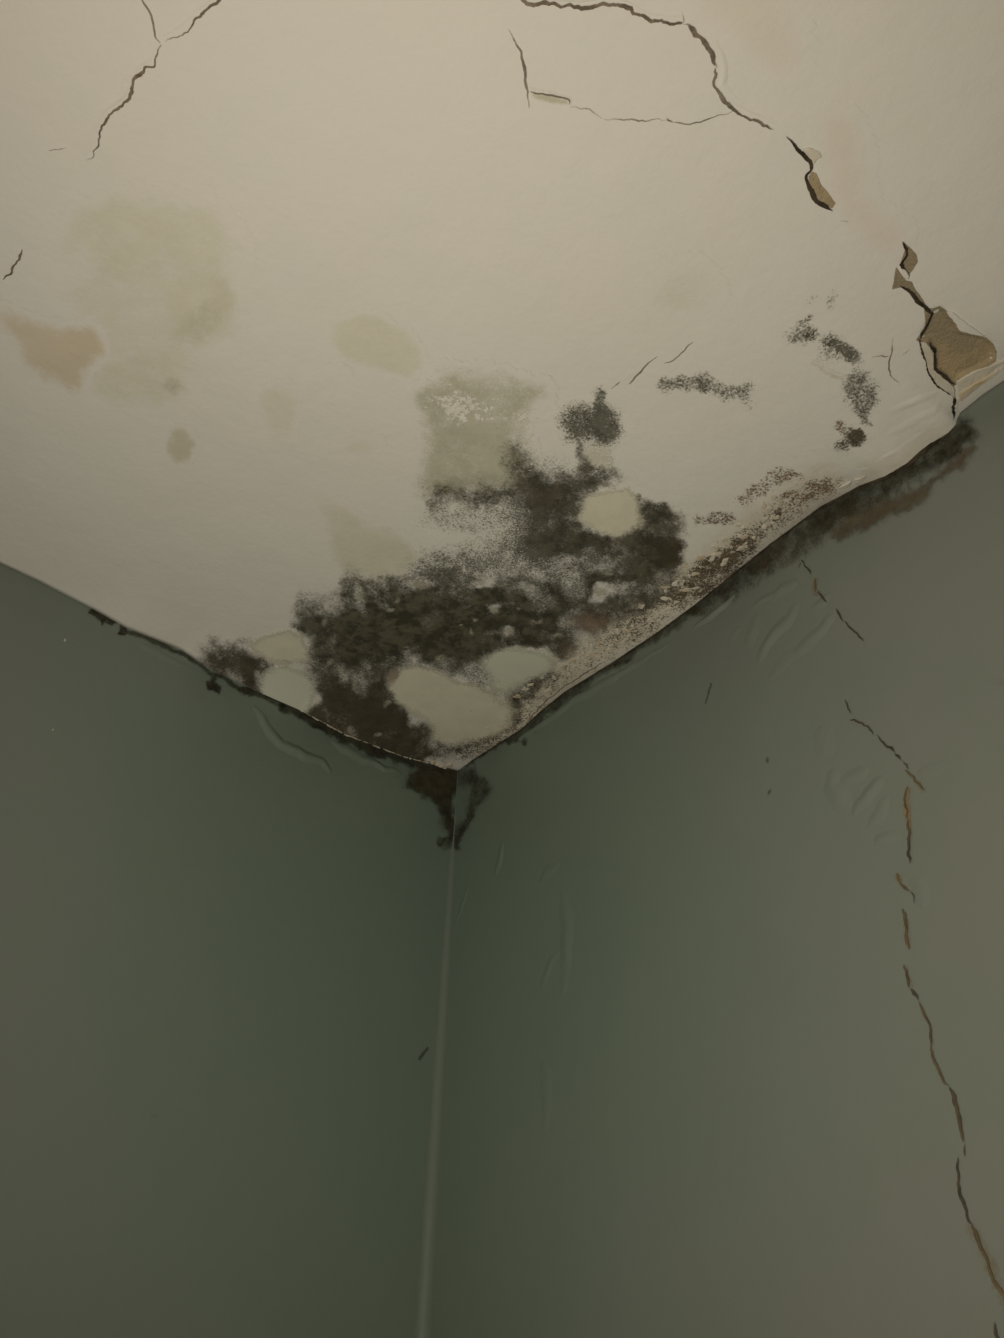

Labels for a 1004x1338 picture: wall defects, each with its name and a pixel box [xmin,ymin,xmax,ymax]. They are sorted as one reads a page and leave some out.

crack [60,0,221,157]
crack [513,0,835,211]
crack [3,250,22,280]
leakage [0,179,258,472]
flaking render [838,243,1004,490]
leakage [89,307,974,849]
crack [845,701,1004,1338]